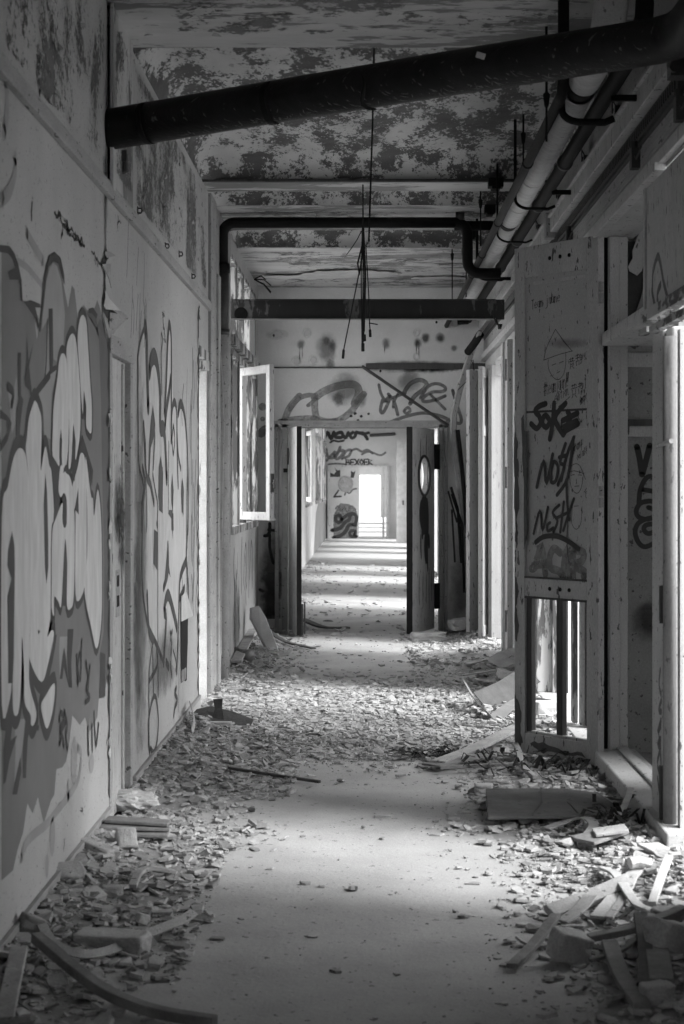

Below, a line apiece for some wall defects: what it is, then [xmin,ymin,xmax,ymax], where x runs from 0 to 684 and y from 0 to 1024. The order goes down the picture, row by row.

peeling [5,0,466,159]
peeling [116,80,557,288]